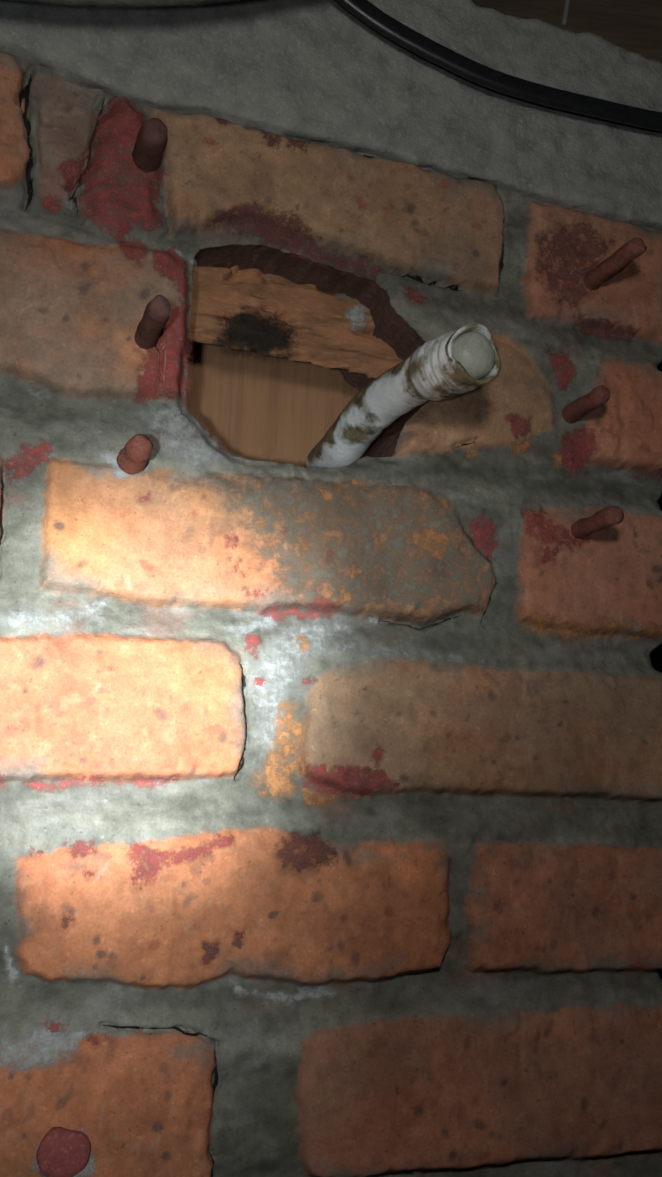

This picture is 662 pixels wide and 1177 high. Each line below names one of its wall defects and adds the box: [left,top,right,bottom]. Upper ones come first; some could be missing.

spalling [44,96,426,402]
spalling [360,401,427,459]
crack [0,467,8,545]
crack [104,1025,218,1111]